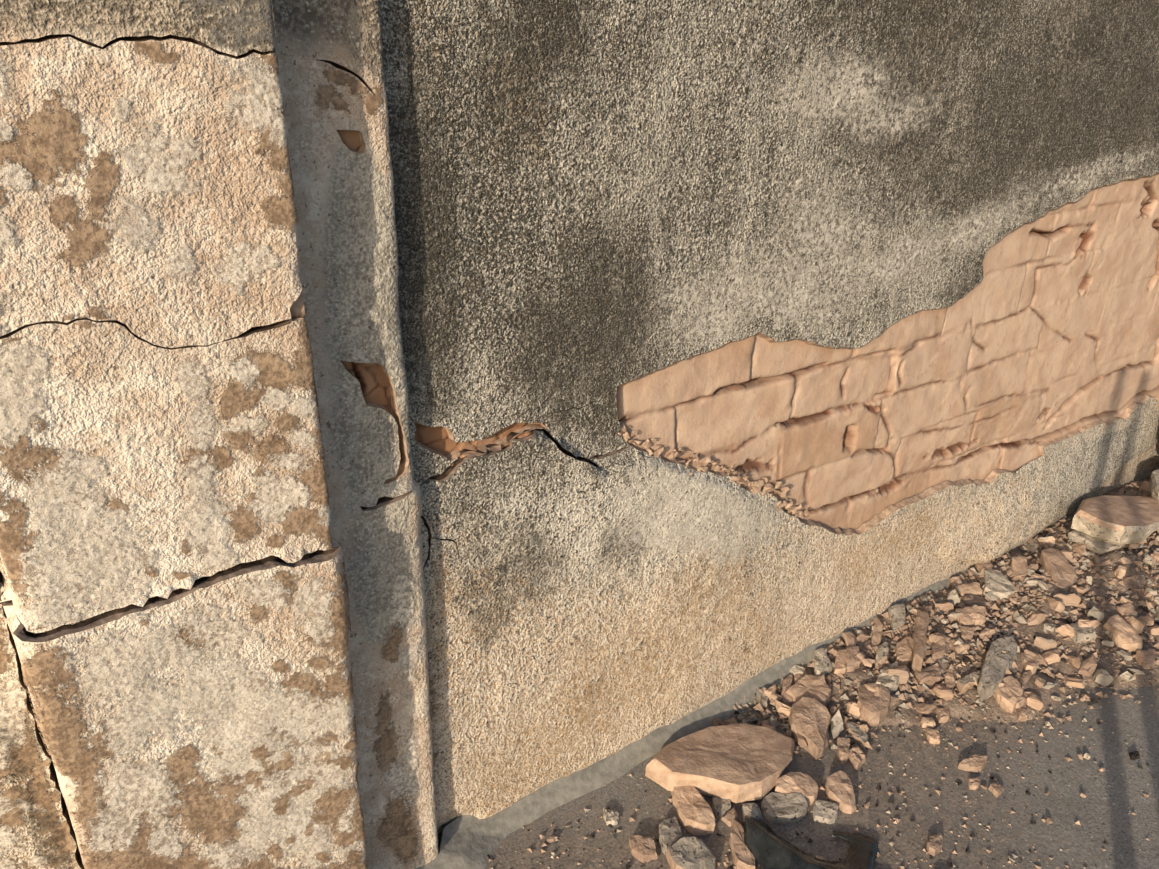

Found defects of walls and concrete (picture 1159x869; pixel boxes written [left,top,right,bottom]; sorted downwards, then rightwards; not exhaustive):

crack [0,34,275,59]
peeling [0,57,283,298]
crack [0,318,291,350]
peeling [220,55,298,232]
crack [318,60,375,95]
leakage [393,95,451,414]
spalling [340,360,547,484]
leakage [480,0,588,151]
leakage [515,0,1159,445]
spalling [616,172,1159,535]
peeling [0,280,444,869]
crack [0,547,341,869]